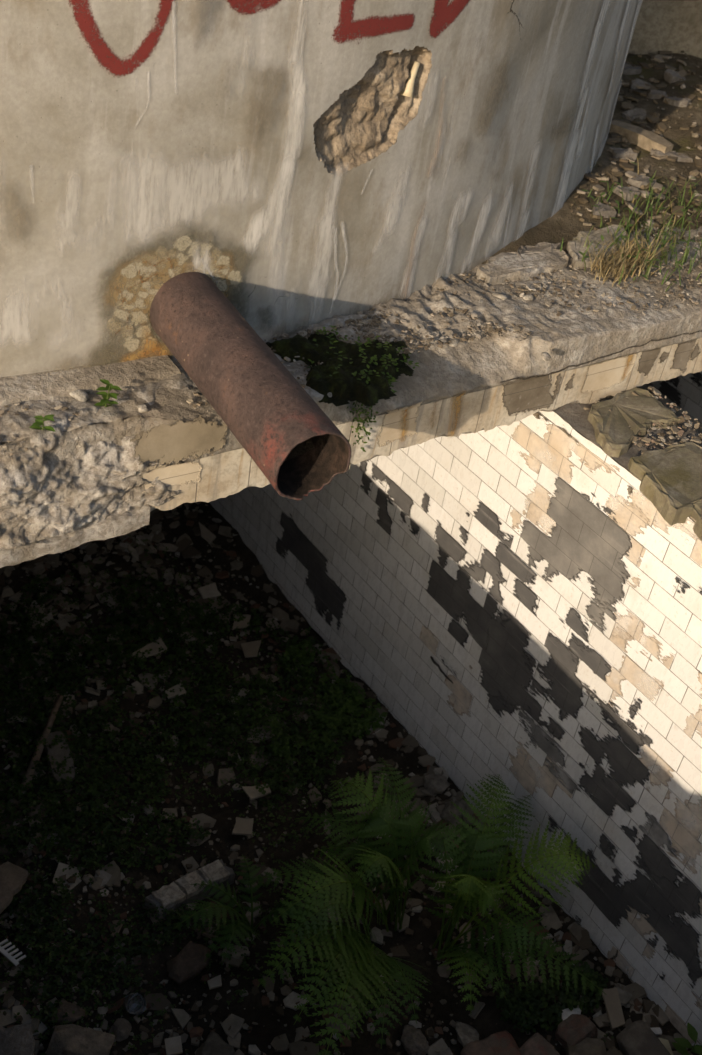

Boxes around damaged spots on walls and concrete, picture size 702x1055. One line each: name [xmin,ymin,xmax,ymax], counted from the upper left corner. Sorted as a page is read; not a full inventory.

spalling [313,46,432,178]
spalling [0,359,228,552]
peeling [276,512,347,630]
peeling [359,340,702,1010]